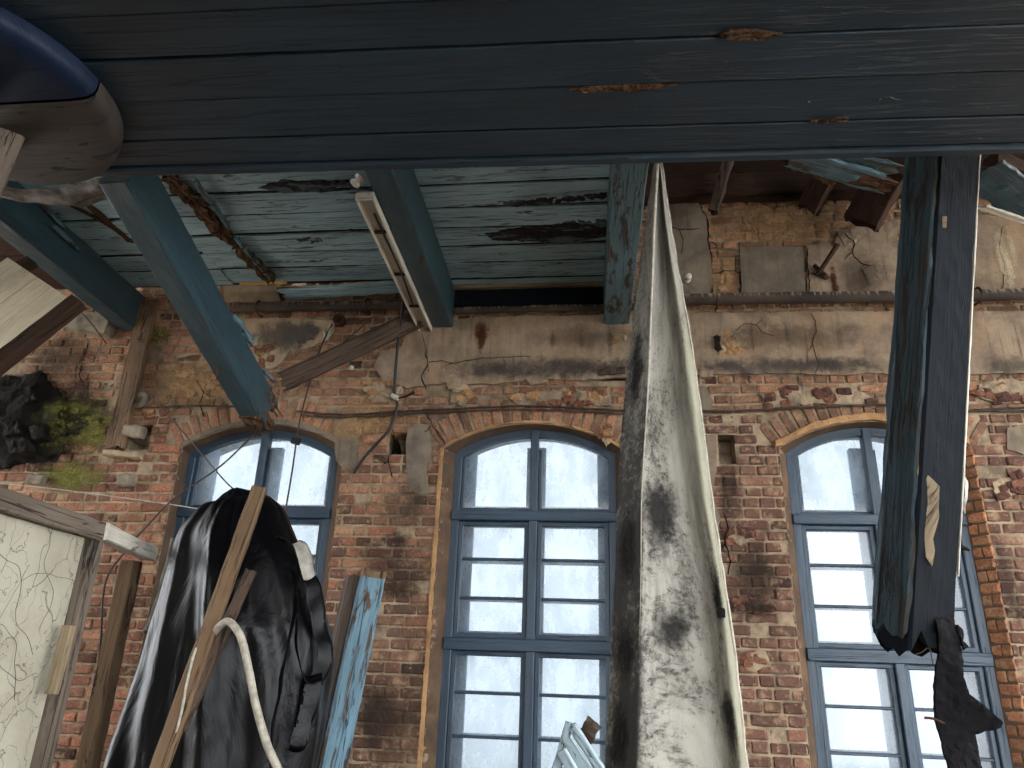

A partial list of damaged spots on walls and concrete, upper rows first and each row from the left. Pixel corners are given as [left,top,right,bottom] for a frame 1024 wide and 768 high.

crack [845,233,871,266]
crack [807,247,819,373]
water stain [253,321,320,352]
crack [421,353,528,387]
spalling [593,423,614,448]
peeling [1006,424,1024,455]
spalling [992,469,1024,501]